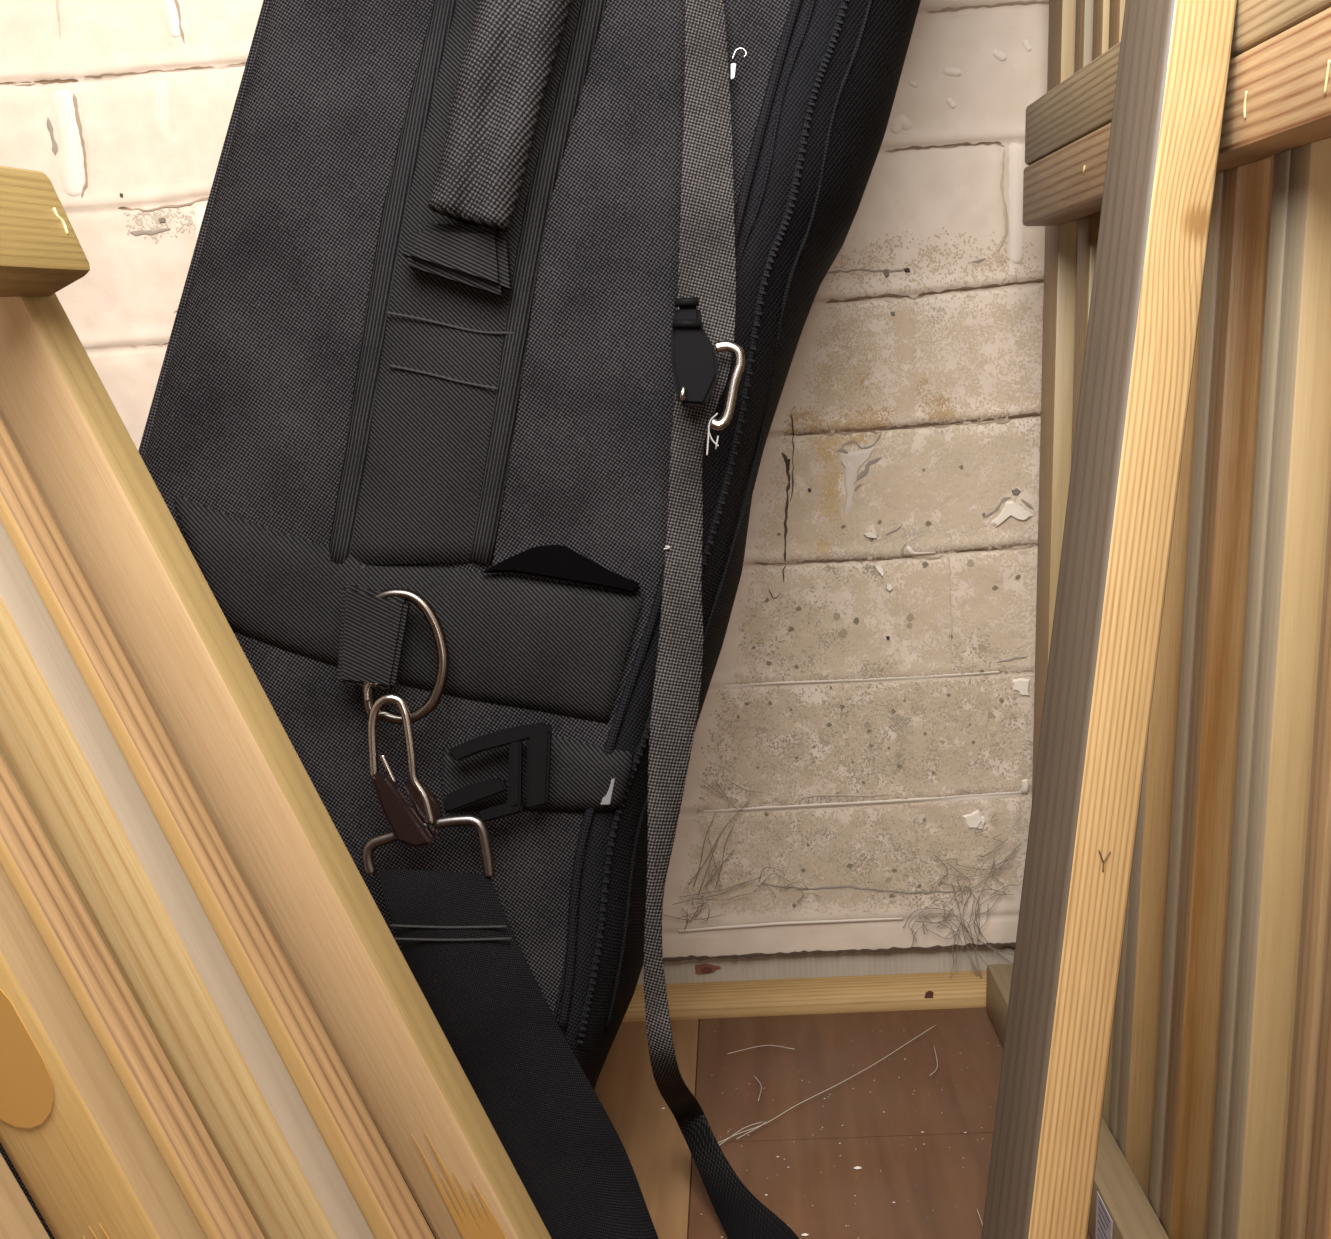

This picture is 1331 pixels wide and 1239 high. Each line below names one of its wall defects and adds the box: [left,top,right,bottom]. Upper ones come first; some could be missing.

crack [762,883,957,894]
crack [663,942,1016,962]